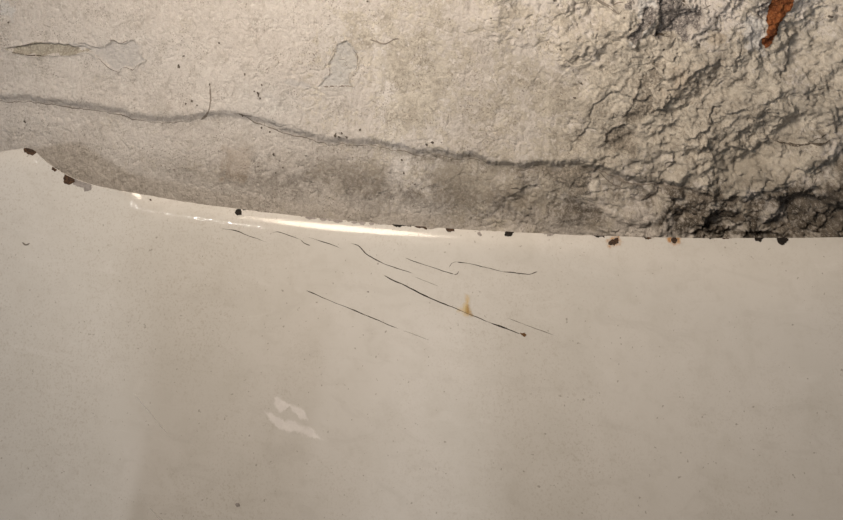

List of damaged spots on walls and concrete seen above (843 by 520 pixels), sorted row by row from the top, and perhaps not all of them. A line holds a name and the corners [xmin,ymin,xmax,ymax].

peeling [5,39,147,74]
crack [0,89,211,124]
spalling [623,0,711,50]
leakage [648,55,708,109]
peeling [740,1,772,59]
rust [761,0,794,48]
crack [239,113,540,171]
leakage [780,149,843,238]
crack [228,229,550,339]
rust [456,293,474,319]